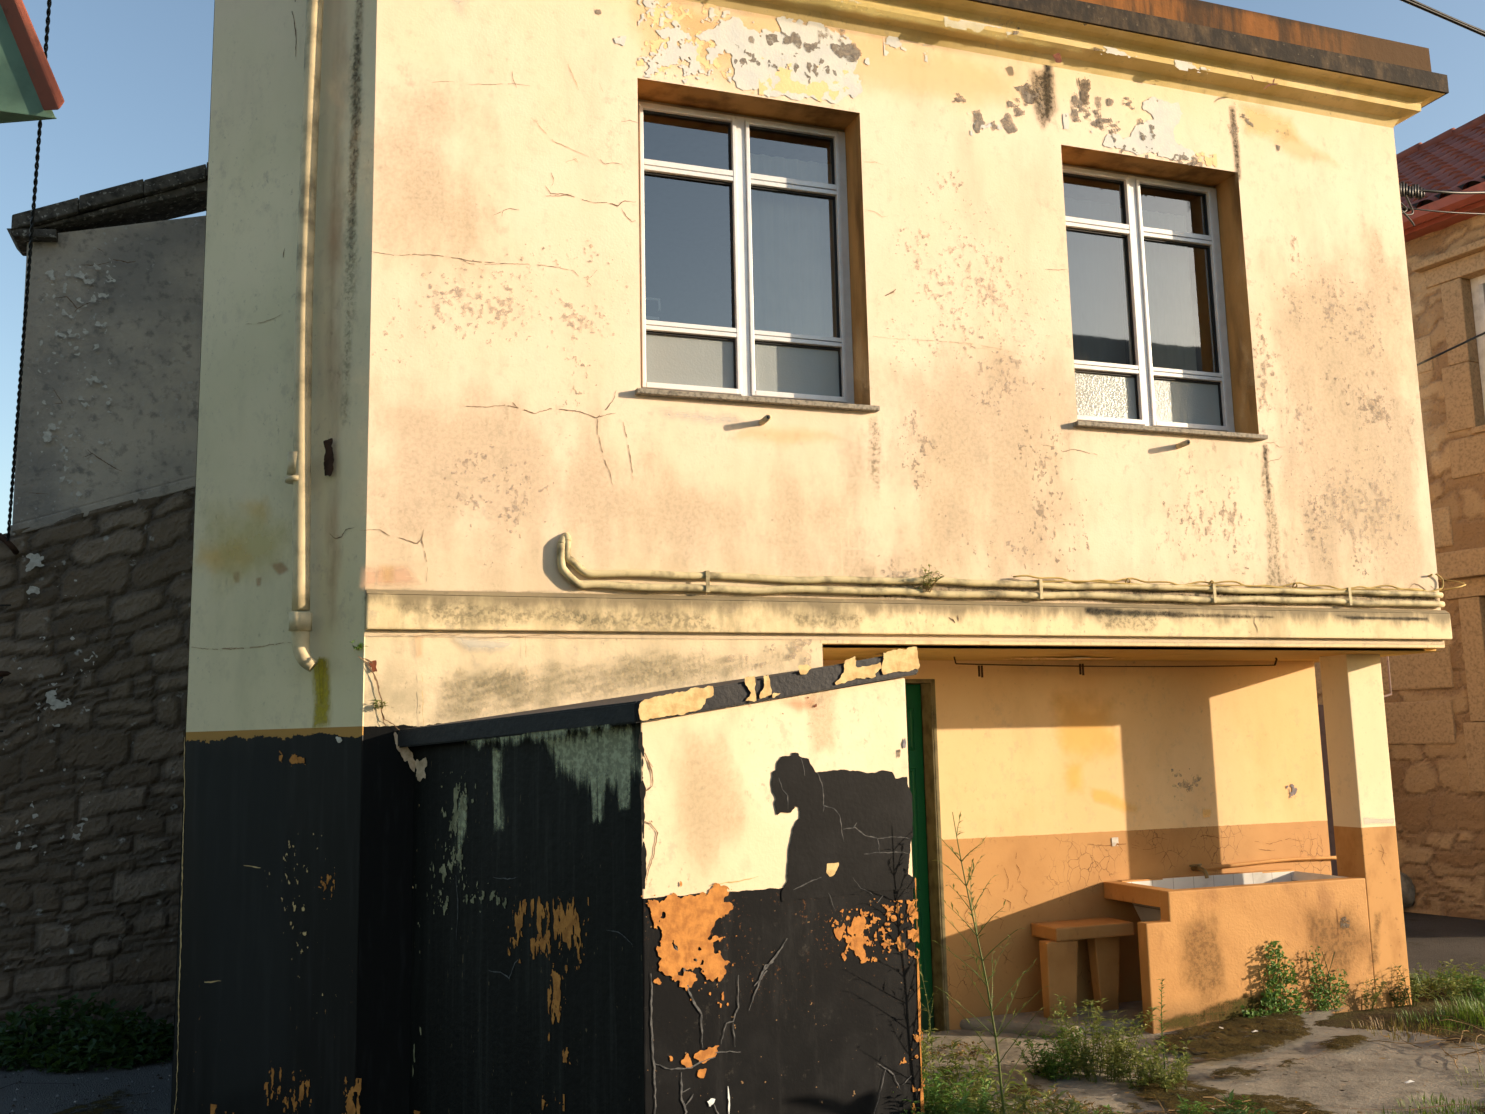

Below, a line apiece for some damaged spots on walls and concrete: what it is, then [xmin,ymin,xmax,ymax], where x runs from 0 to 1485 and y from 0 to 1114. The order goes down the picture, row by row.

peeling [614,0,928,104]
flaking render [954,80,1043,136]
peeling [1063,73,1217,167]
crack [468,392,633,485]
peeling [745,675,780,702]
peeling [835,647,920,685]
water stain [458,797,466,847]
spalling [394,732,581,1024]
water stain [493,750,502,826]
water stain [548,724,635,822]
peeling [638,686,737,1008]
peeling [829,877,925,1114]